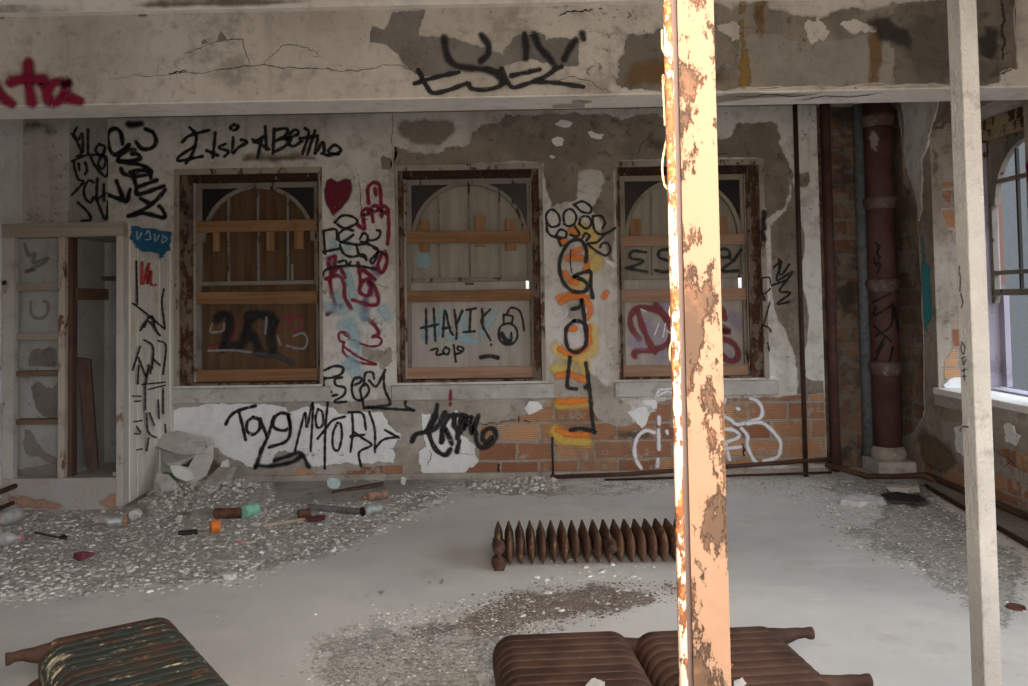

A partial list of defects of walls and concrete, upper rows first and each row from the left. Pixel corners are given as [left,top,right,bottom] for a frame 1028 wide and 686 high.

crack [117,38,415,79]
peeling [369,8,581,77]
spalling [614,26,665,94]
rust [738,1,765,88]
spalling [714,0,950,104]
spalling [976,0,1019,87]
flaking render [380,99,666,262]
flaking render [717,121,827,469]
flaking render [944,319,961,379]
flaking render [0,357,674,608]
flaking render [940,419,965,487]
flaking render [993,423,1028,508]